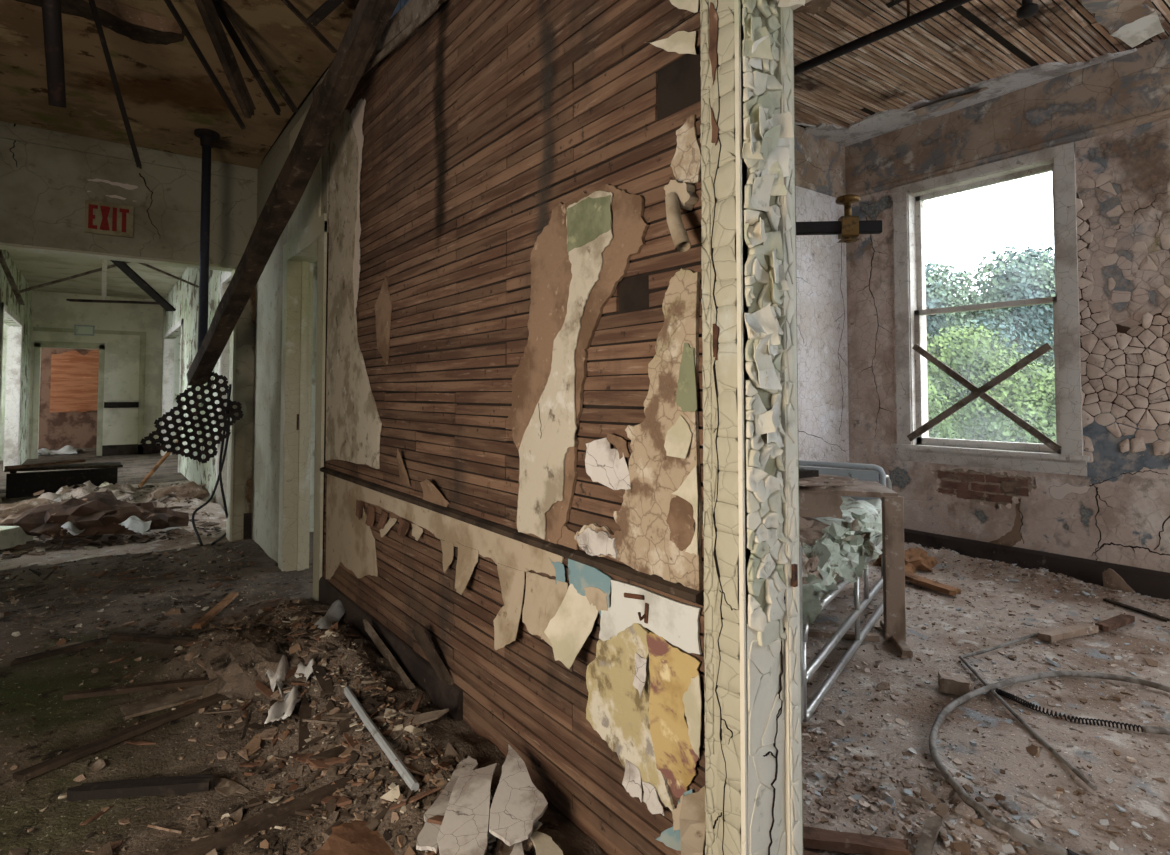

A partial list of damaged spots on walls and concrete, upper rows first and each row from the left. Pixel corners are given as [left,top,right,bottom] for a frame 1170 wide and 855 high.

flaking render [325,109,649,669]
crack [798,218,892,451]
peeling [650,0,1170,855]
crack [1090,470,1170,561]